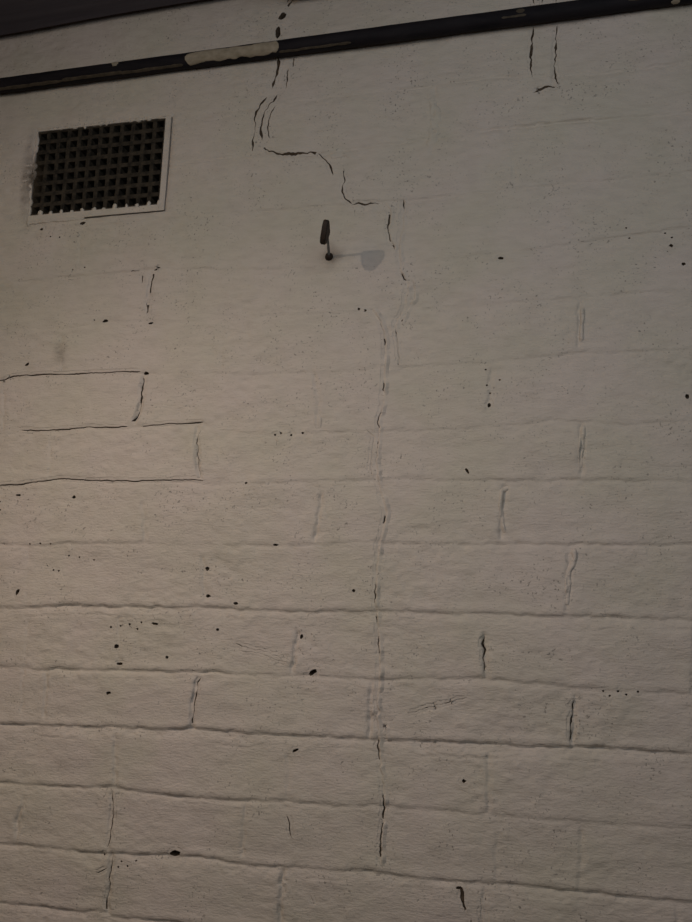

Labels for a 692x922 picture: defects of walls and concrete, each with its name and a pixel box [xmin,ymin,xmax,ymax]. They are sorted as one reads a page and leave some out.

crack [527,0,562,95]
crack [249,56,468,870]